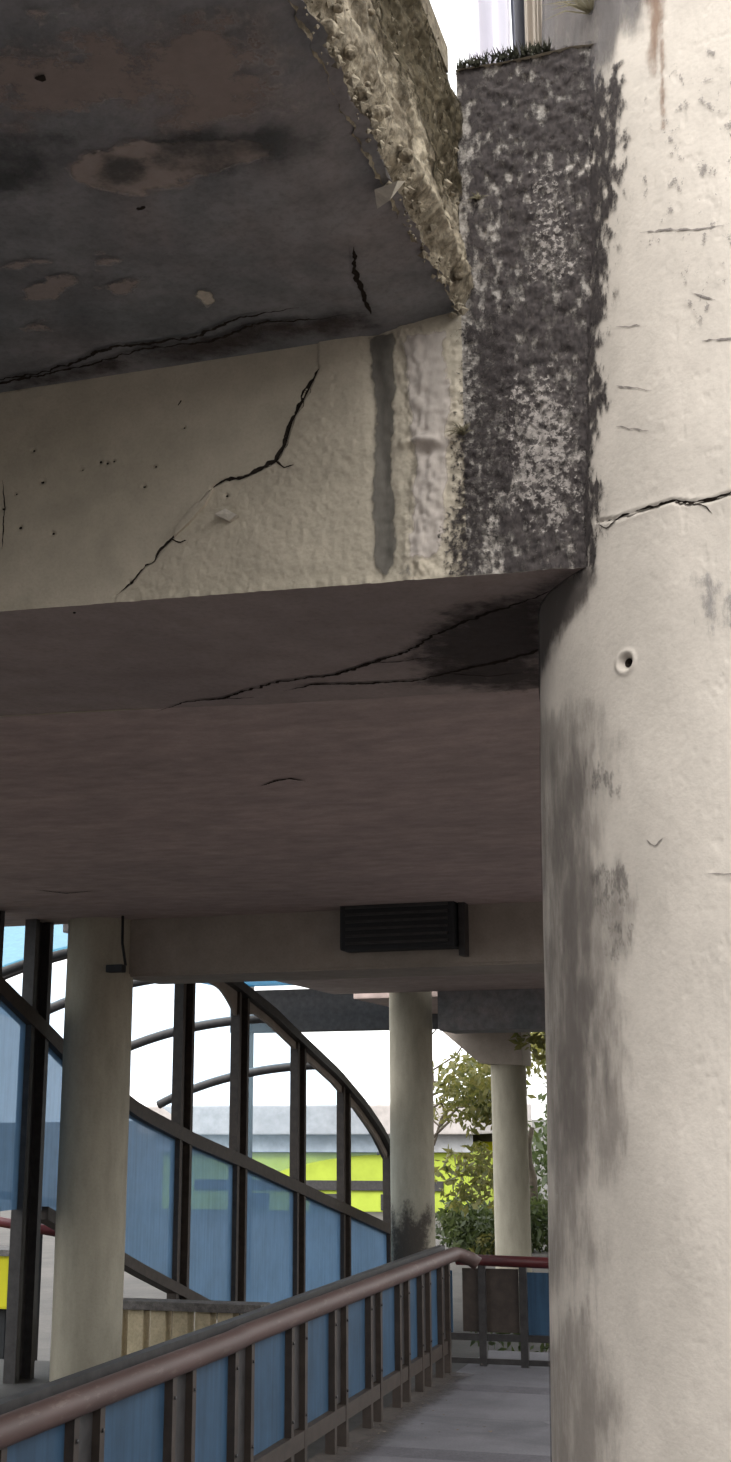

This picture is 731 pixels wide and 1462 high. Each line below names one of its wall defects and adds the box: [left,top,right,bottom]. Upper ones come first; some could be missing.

corrosion [651,0,662,57]
damp [0,0,641,577]
crack [118,369,319,594]
crack [600,492,731,529]
crack [162,588,555,710]